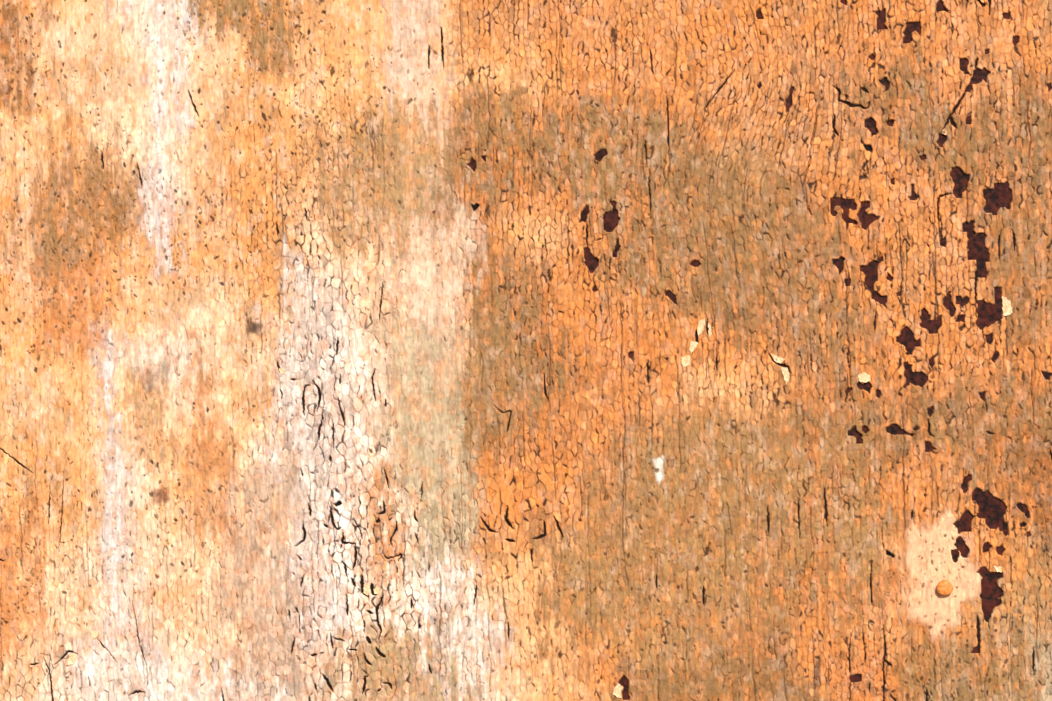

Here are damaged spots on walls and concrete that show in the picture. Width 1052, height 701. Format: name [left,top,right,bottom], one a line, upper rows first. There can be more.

crack [939,59,978,135]
corrosion [190,348,239,544]
crack [277,338,345,462]
corrosion [519,327,608,449]
peeling [830,198,879,230]
peeling [832,257,901,307]
peeling [897,287,1012,388]
peeling [963,221,990,278]
crack [289,469,430,695]
corrosion [368,464,402,582]
corrosion [851,565,901,701]
peeling [886,475,1031,641]